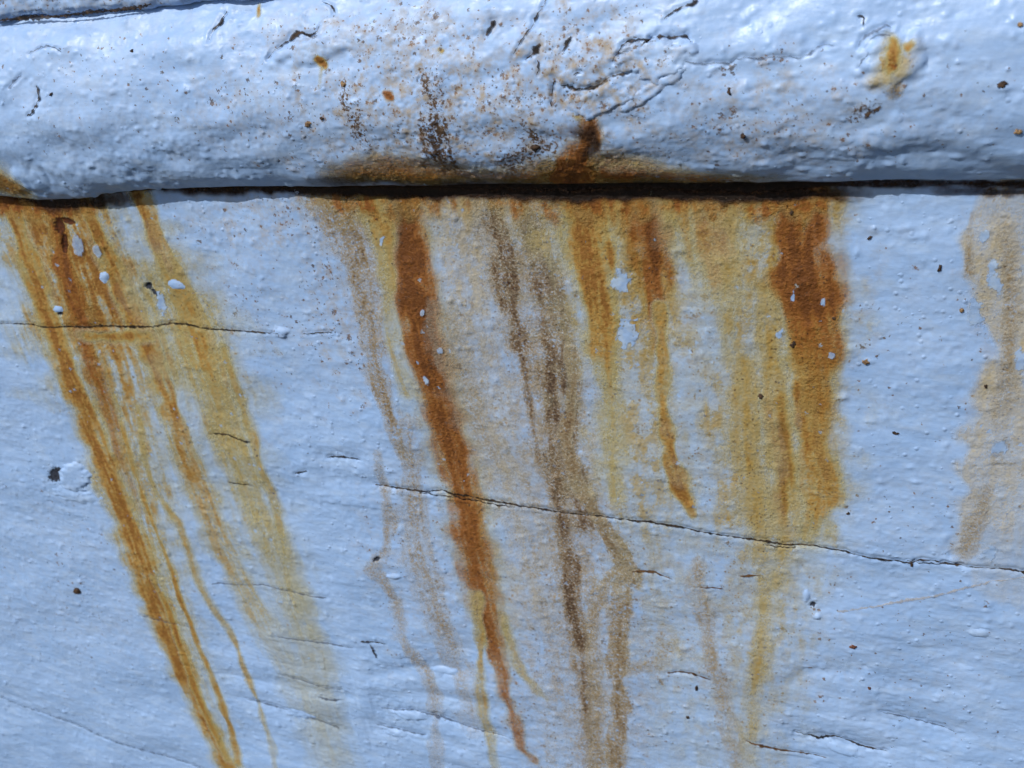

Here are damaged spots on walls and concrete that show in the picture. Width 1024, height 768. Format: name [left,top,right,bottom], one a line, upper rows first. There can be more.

corrosion [846,36,915,123]
crack [0,322,332,335]
corrosion [0,170,296,768]
corrosion [162,116,1024,763]
crack [375,484,1024,574]
crack [632,570,671,579]
crack [667,671,710,680]